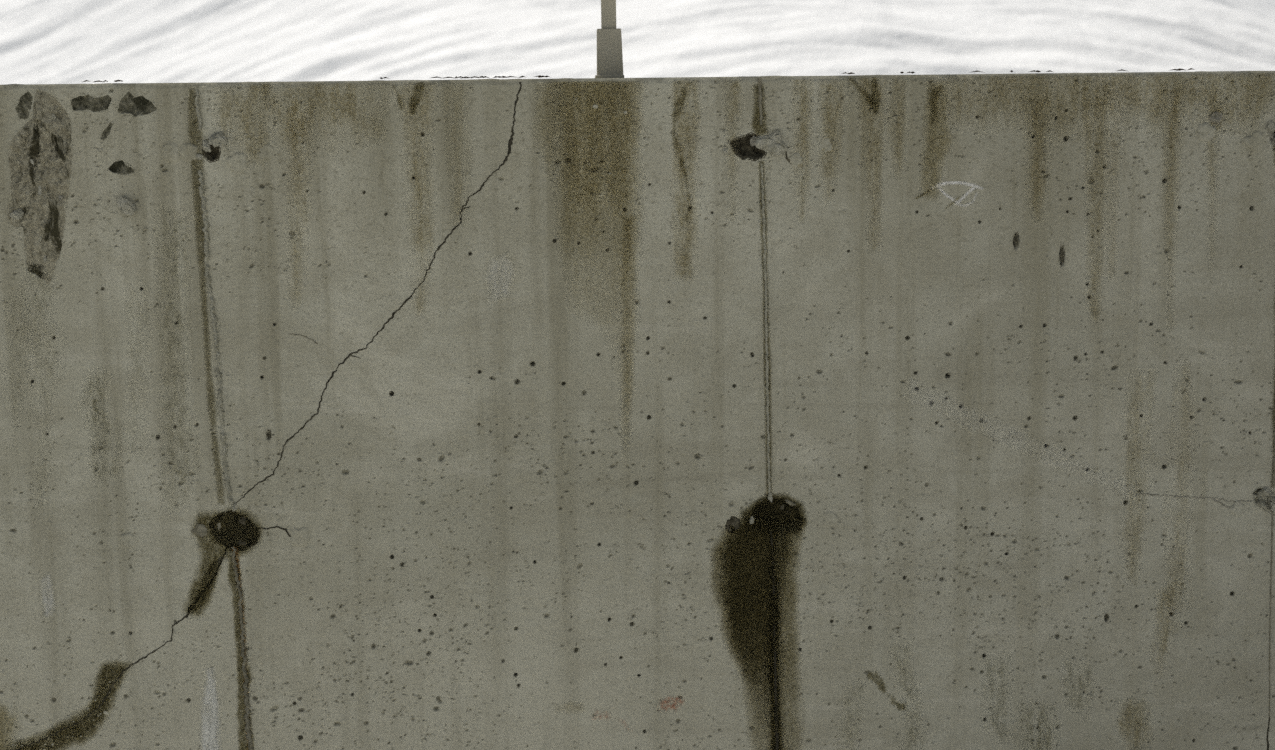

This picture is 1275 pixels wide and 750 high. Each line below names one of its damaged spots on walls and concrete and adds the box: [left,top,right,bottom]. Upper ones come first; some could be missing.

spalling [3,88,159,288]
crack [16,82,522,750]
water stain [731,498,803,750]